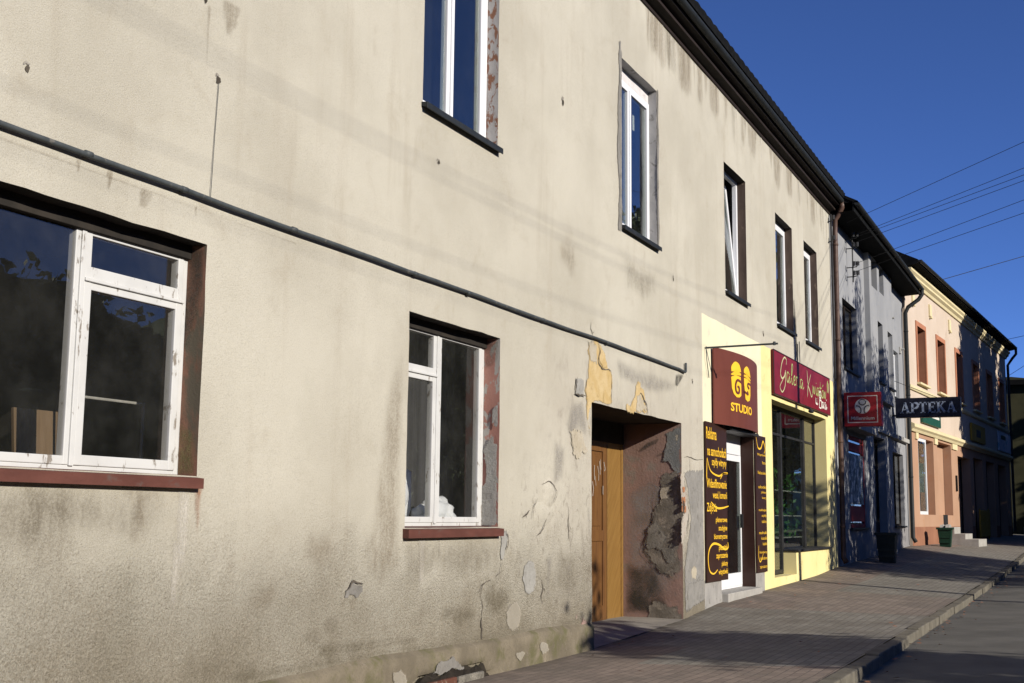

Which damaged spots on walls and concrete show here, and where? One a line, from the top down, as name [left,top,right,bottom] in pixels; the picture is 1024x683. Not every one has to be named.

flaking render [571,340,613,459]
flaking render [626,381,648,414]
peeling [481,405,509,578]
flaking render [642,428,697,579]
flaking render [345,580,363,598]
spalling [393,662,489,683]